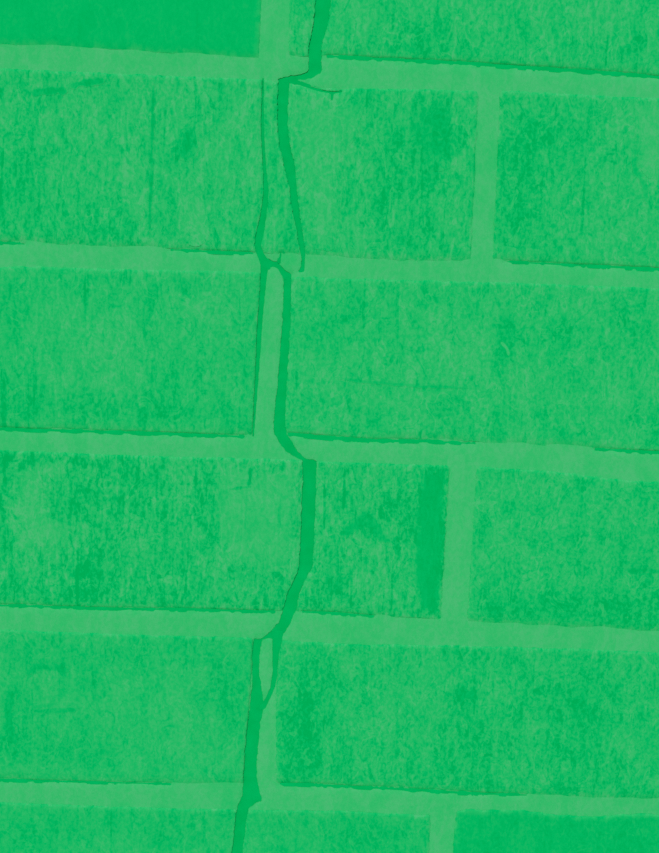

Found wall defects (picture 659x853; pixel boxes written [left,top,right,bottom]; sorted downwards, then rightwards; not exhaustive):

crack [0,78,476,853]
crack [277,0,659,273]